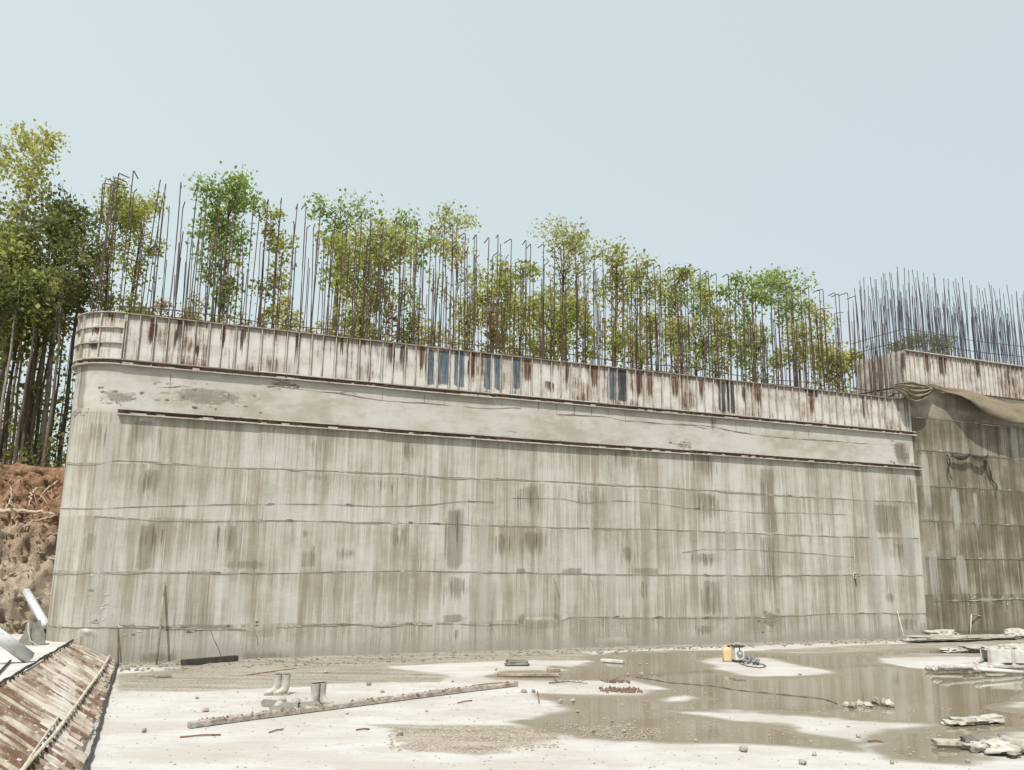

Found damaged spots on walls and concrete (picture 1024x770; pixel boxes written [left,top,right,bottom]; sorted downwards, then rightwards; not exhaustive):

corrosion [149,319,158,341]
corrosion [386,344,426,370]
corrosion [545,363,569,392]
corrosion [636,371,652,395]
corrosion [923,356,947,375]
corrosion [742,386,761,406]
crack [48,460,1024,656]